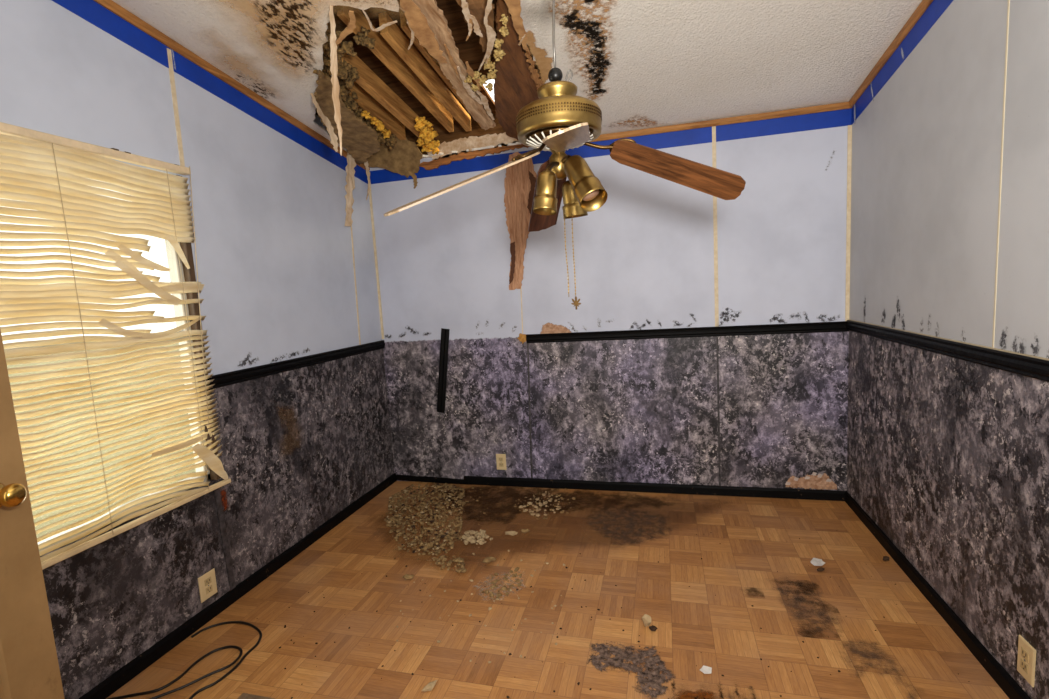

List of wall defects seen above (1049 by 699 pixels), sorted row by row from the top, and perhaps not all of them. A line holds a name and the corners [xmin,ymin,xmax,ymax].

damp [226,0,318,69]
damp [549,0,611,100]
peeling [540,323,571,334]
peeling [785,472,837,490]
damp [446,486,666,543]
damp [778,582,828,638]
damp [671,683,739,699]